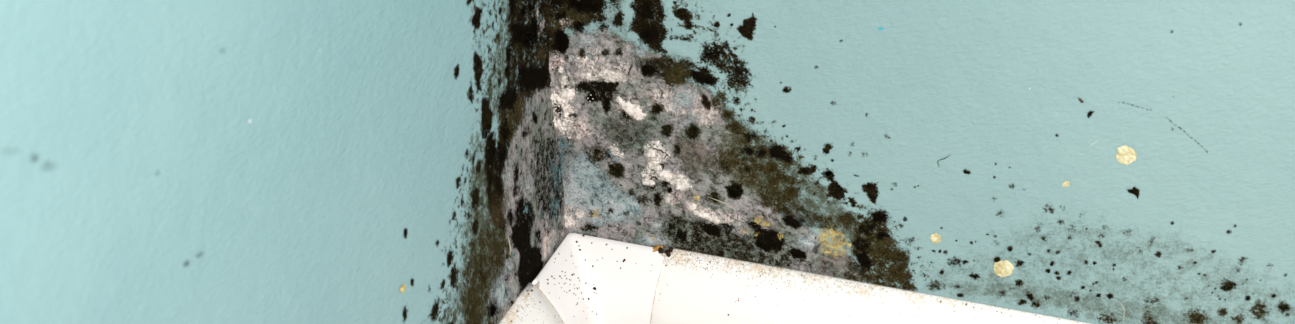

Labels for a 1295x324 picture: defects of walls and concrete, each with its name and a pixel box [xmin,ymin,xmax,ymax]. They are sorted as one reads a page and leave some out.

leakage [400,0,1051,324]
mould [1115,145,1137,165]
leakage [1035,204,1127,281]
leakage [1068,281,1120,324]
leakage [1141,287,1161,324]
leakage [1178,248,1290,324]